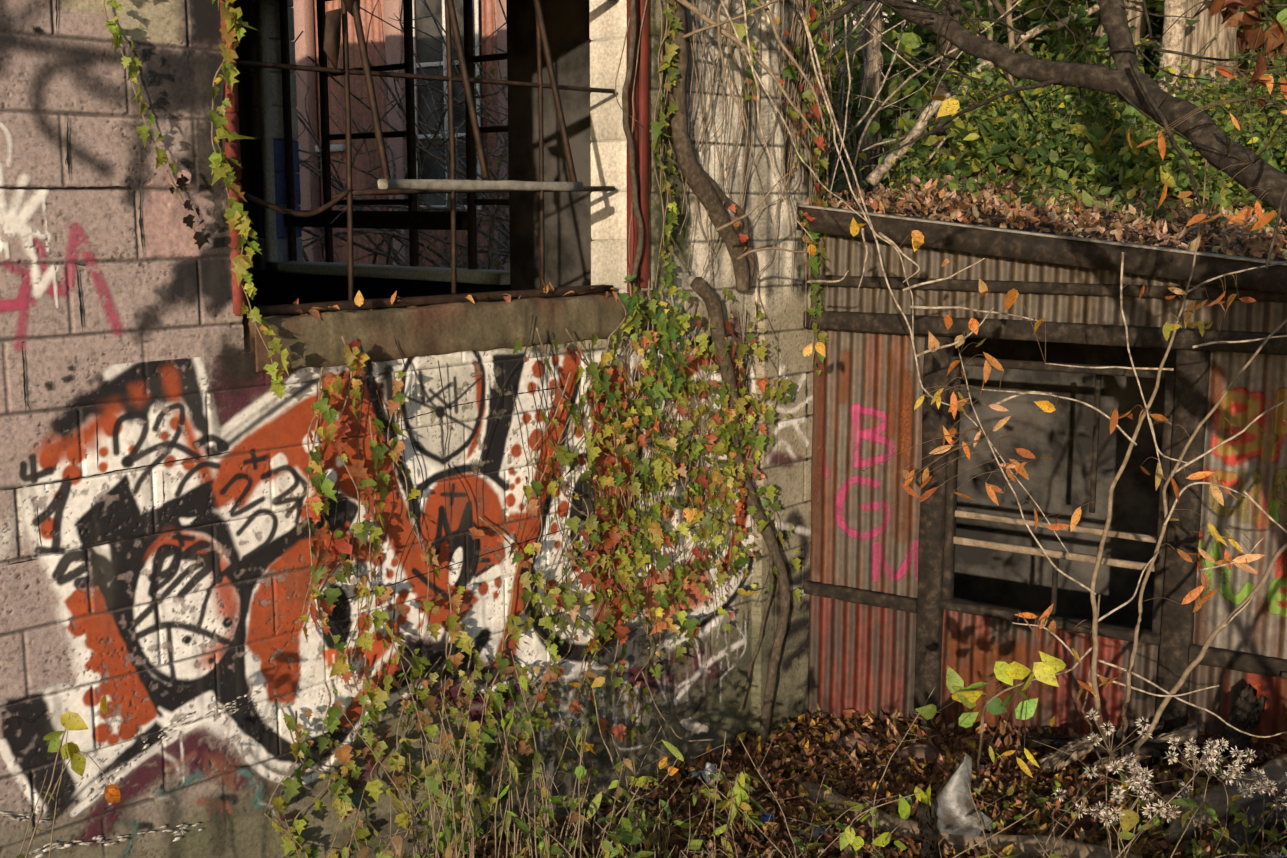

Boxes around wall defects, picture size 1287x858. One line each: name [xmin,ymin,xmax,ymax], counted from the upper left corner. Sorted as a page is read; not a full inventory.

damp [649,0,694,289]
damp [738,0,820,247]
damp [794,230,812,294]
corrosion [812,353,850,533]
corrosion [887,352,912,473]
corrosion [945,636,1055,735]